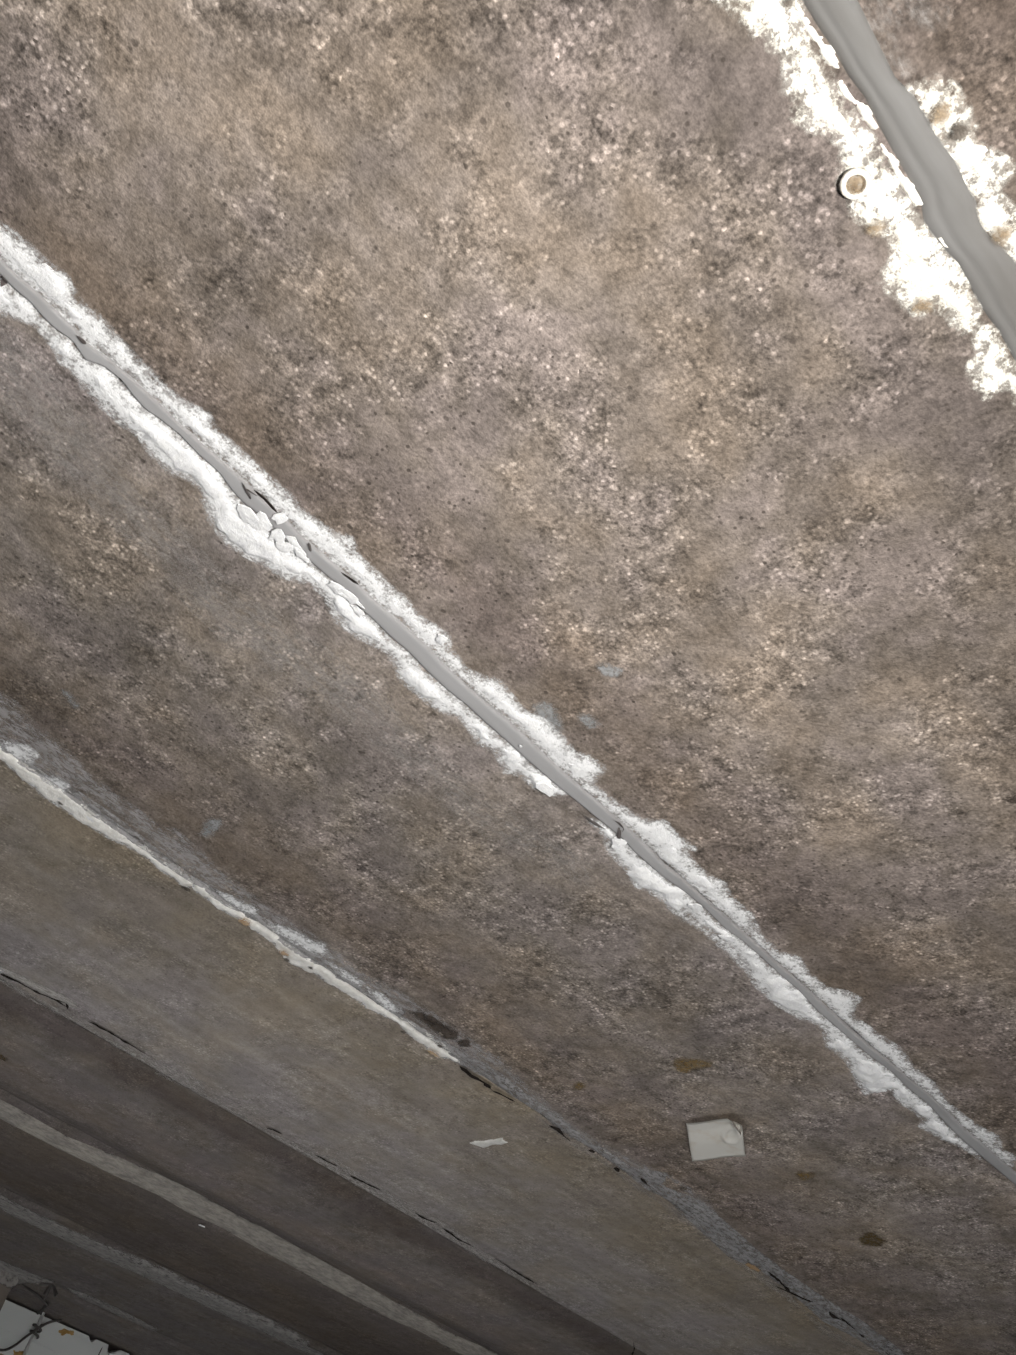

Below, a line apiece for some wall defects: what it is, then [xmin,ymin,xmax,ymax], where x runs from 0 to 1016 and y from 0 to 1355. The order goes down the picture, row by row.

water stain [718,0,1016,400]
crack [242,483,278,513]
water stain [0,225,1015,1167]
crack [584,815,624,839]
crack [0,973,145,1054]
crack [460,1066,515,1102]
crack [316,1155,380,1190]
crack [549,1125,647,1184]